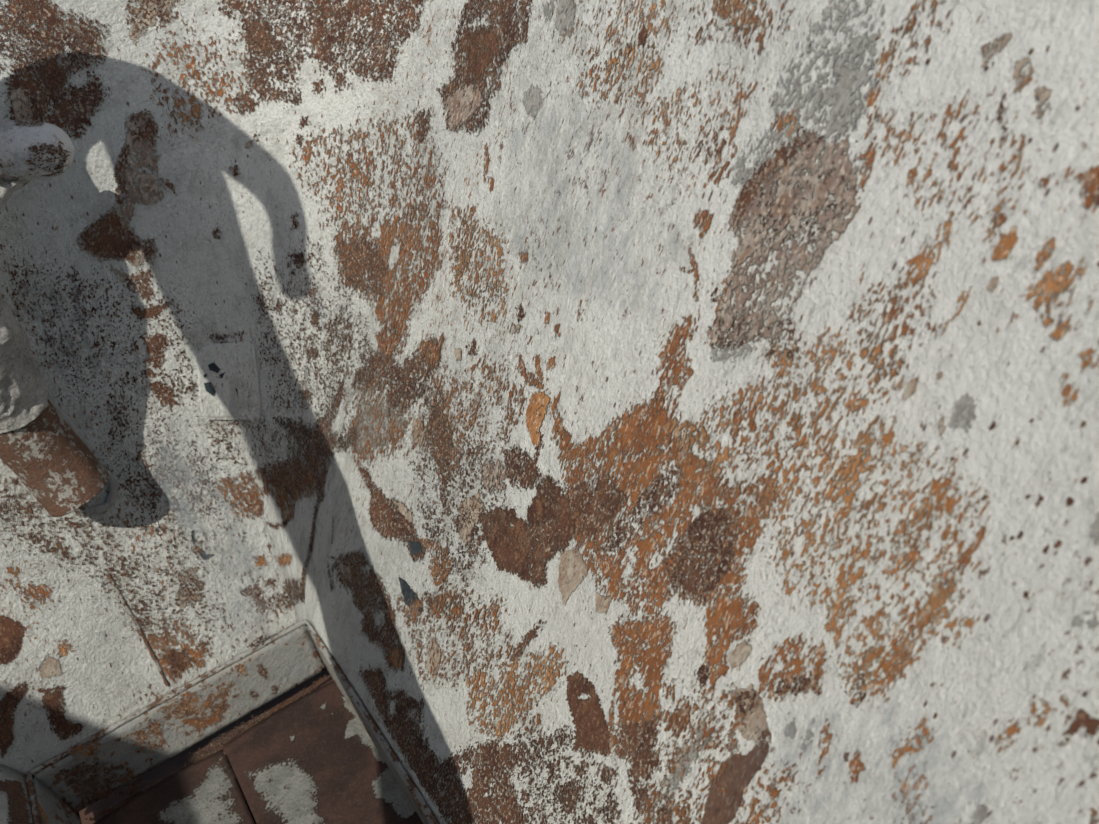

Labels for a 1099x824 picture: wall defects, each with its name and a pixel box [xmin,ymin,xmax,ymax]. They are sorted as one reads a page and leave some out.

corrosion [136,0,435,146]
corrosion [436,0,532,136]
corrosion [548,0,794,188]
peeling [701,0,889,353]
corrosion [857,0,982,221]
spalling [937,394,978,437]
spalling [32,635,74,679]
peeling [398,577,423,618]
peeling [558,547,588,606]
peeling [702,680,818,824]
corrosion [753,633,831,703]
corrosion [995,689,1099,754]